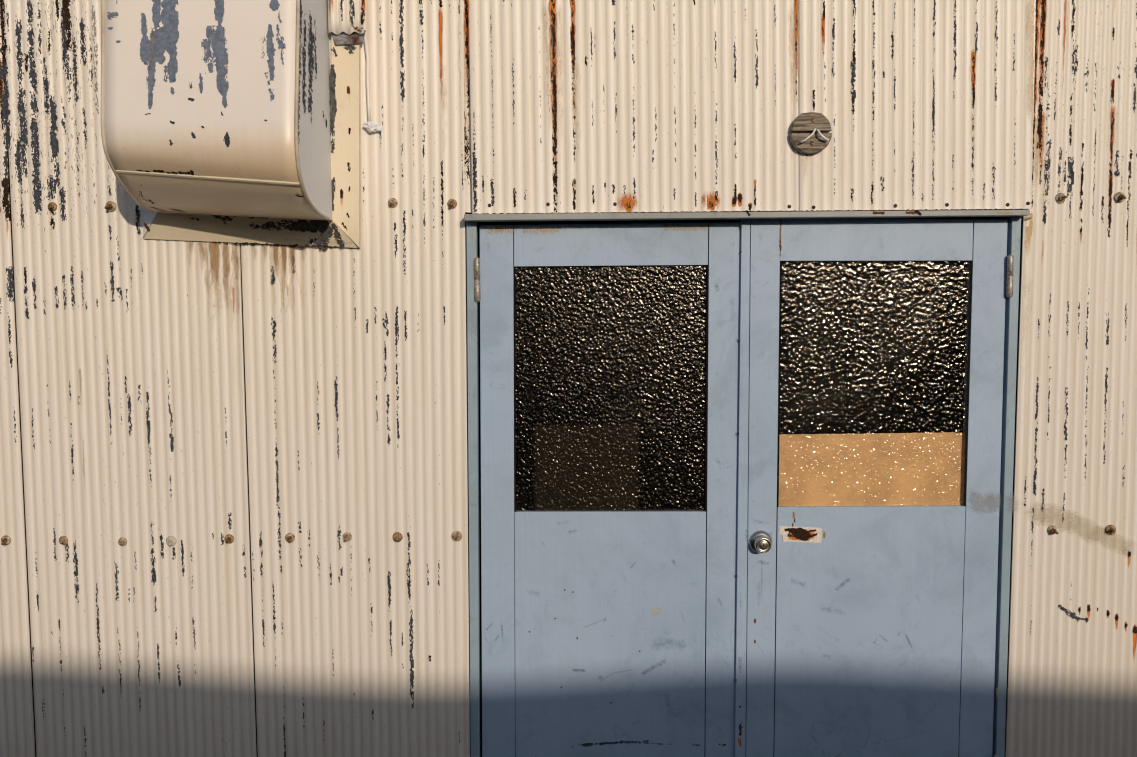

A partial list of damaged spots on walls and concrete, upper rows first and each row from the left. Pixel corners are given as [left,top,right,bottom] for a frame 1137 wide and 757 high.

peeling [0,0,121,229]
peeling [140,0,179,115]
peeling [188,0,229,116]
water stain [212,241,352,249]
rust [546,0,576,212]
rust [702,193,752,216]
rust [1027,0,1047,244]
rust [1107,79,1115,237]
peeling [107,355,152,484]
peeling [150,521,193,612]
peeling [387,532,414,709]
rust [1078,605,1137,655]